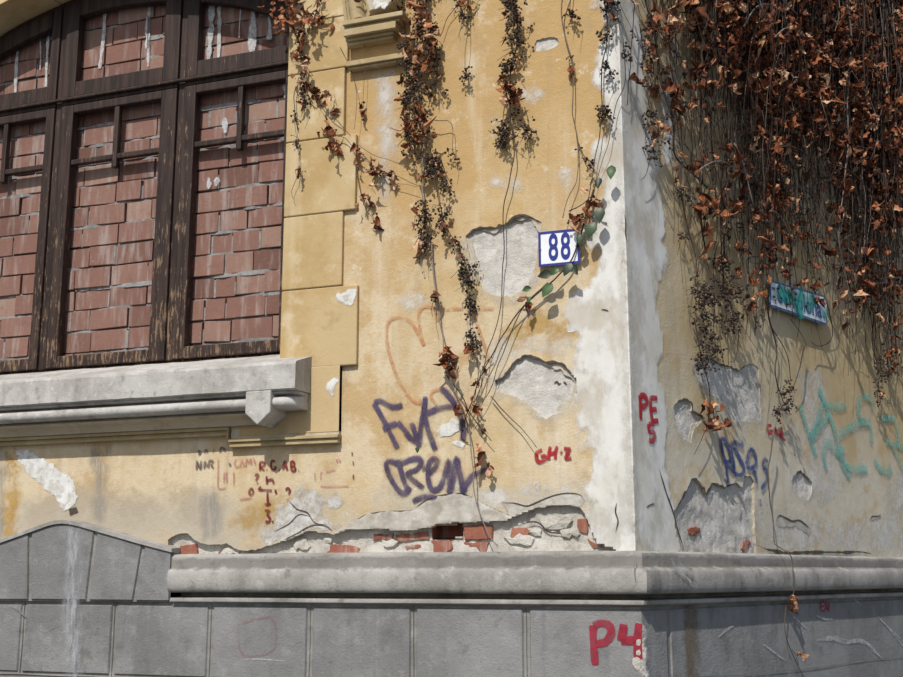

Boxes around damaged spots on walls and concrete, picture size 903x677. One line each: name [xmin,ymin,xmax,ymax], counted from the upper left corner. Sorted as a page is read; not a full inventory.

spalling [535,38,559,52]
spalling [463,214,542,301]
spalling [489,354,577,419]
spalling [674,398,703,443]
spalling [694,358,763,426]
peeling [16,449,78,515]
spalling [171,487,616,554]
spalling [674,476,871,555]
spalling [790,470,811,503]